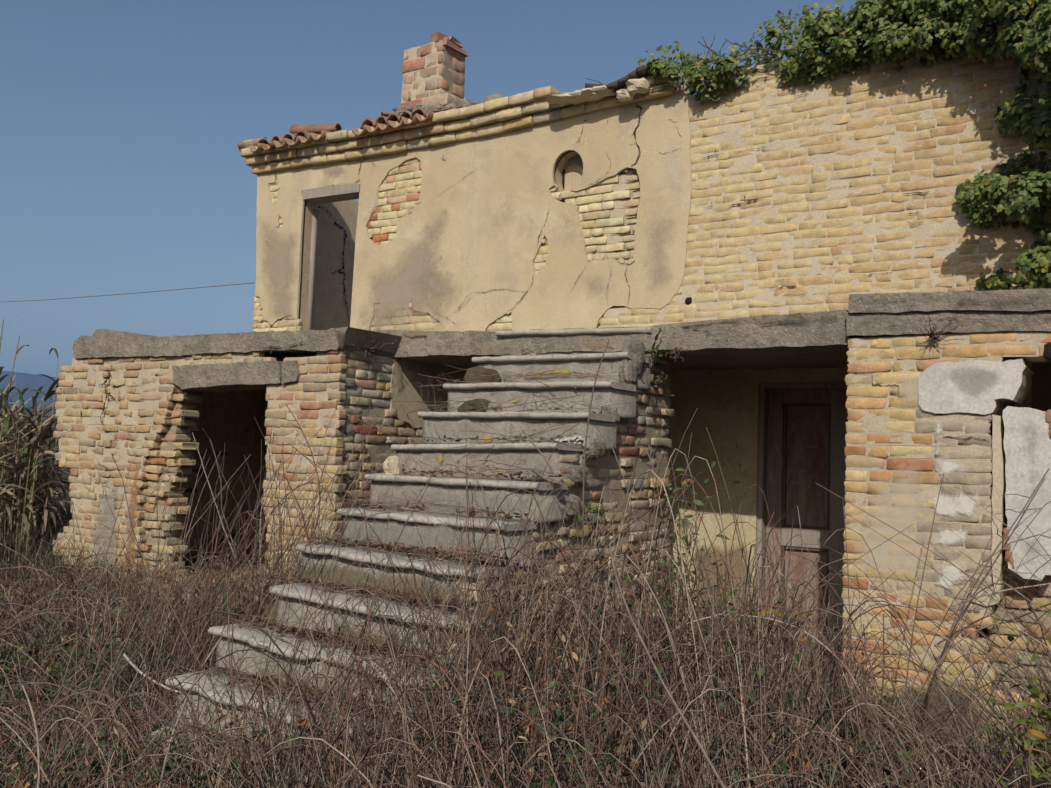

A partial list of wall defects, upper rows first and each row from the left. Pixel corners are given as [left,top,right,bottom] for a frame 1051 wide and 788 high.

crack [590,103,682,185]
crack [318,138,369,325]
flaking render [367,158,422,245]
flaking render [550,168,640,265]
crack [435,274,534,323]